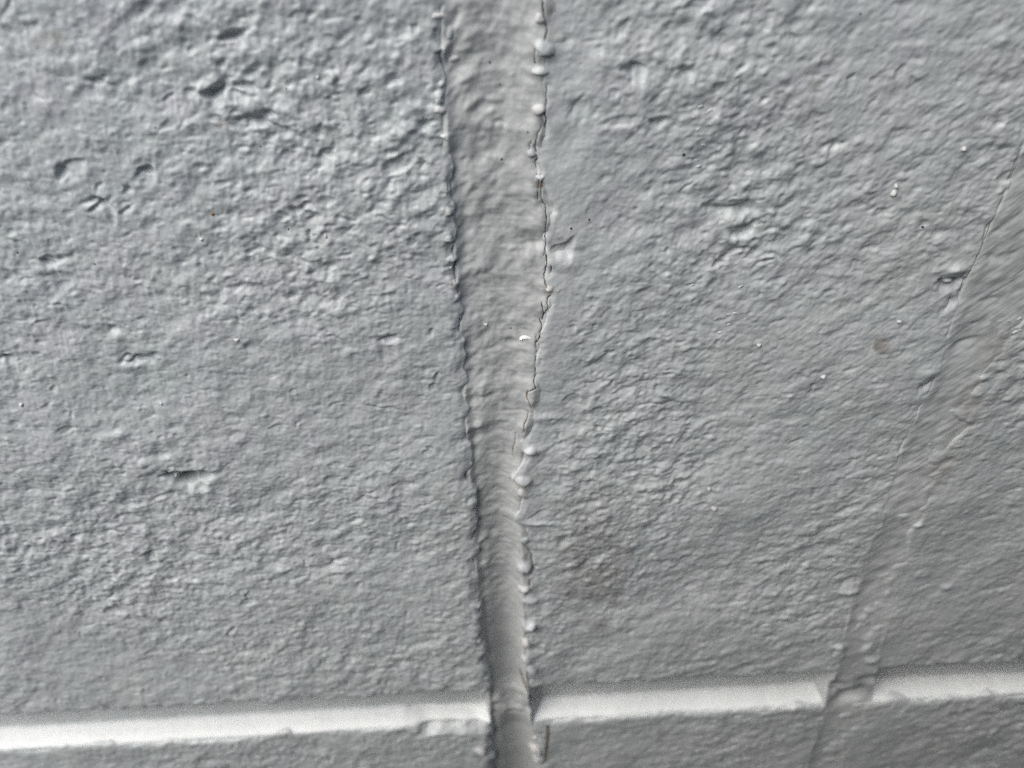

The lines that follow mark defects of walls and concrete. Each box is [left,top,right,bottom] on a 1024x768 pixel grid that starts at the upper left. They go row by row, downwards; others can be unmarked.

crack [512,0,552,459]